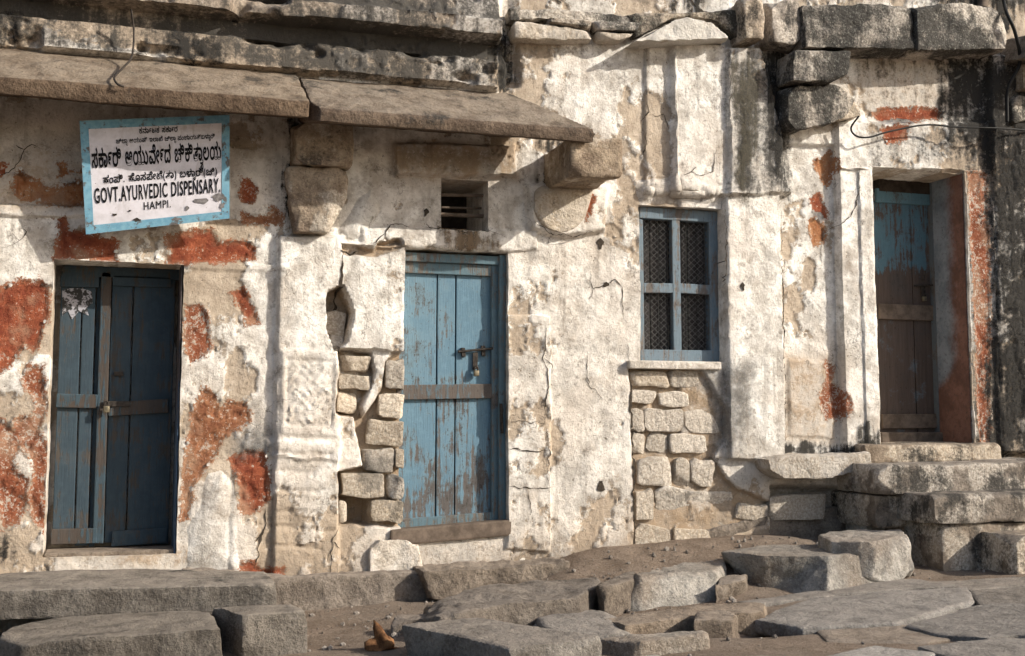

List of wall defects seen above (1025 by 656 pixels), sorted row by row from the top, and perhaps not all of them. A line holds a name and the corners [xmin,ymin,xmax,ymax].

crack [641,97,669,166]
leakage [731,50,785,206]
peeling [868,105,943,145]
peeling [0,160,122,262]
peeling [806,149,843,247]
leakage [935,53,1025,457]
peeling [182,303,216,366]
peeling [228,285,263,327]
peeling [0,274,53,535]
peeling [177,384,275,523]
leakage [0,534,19,563]